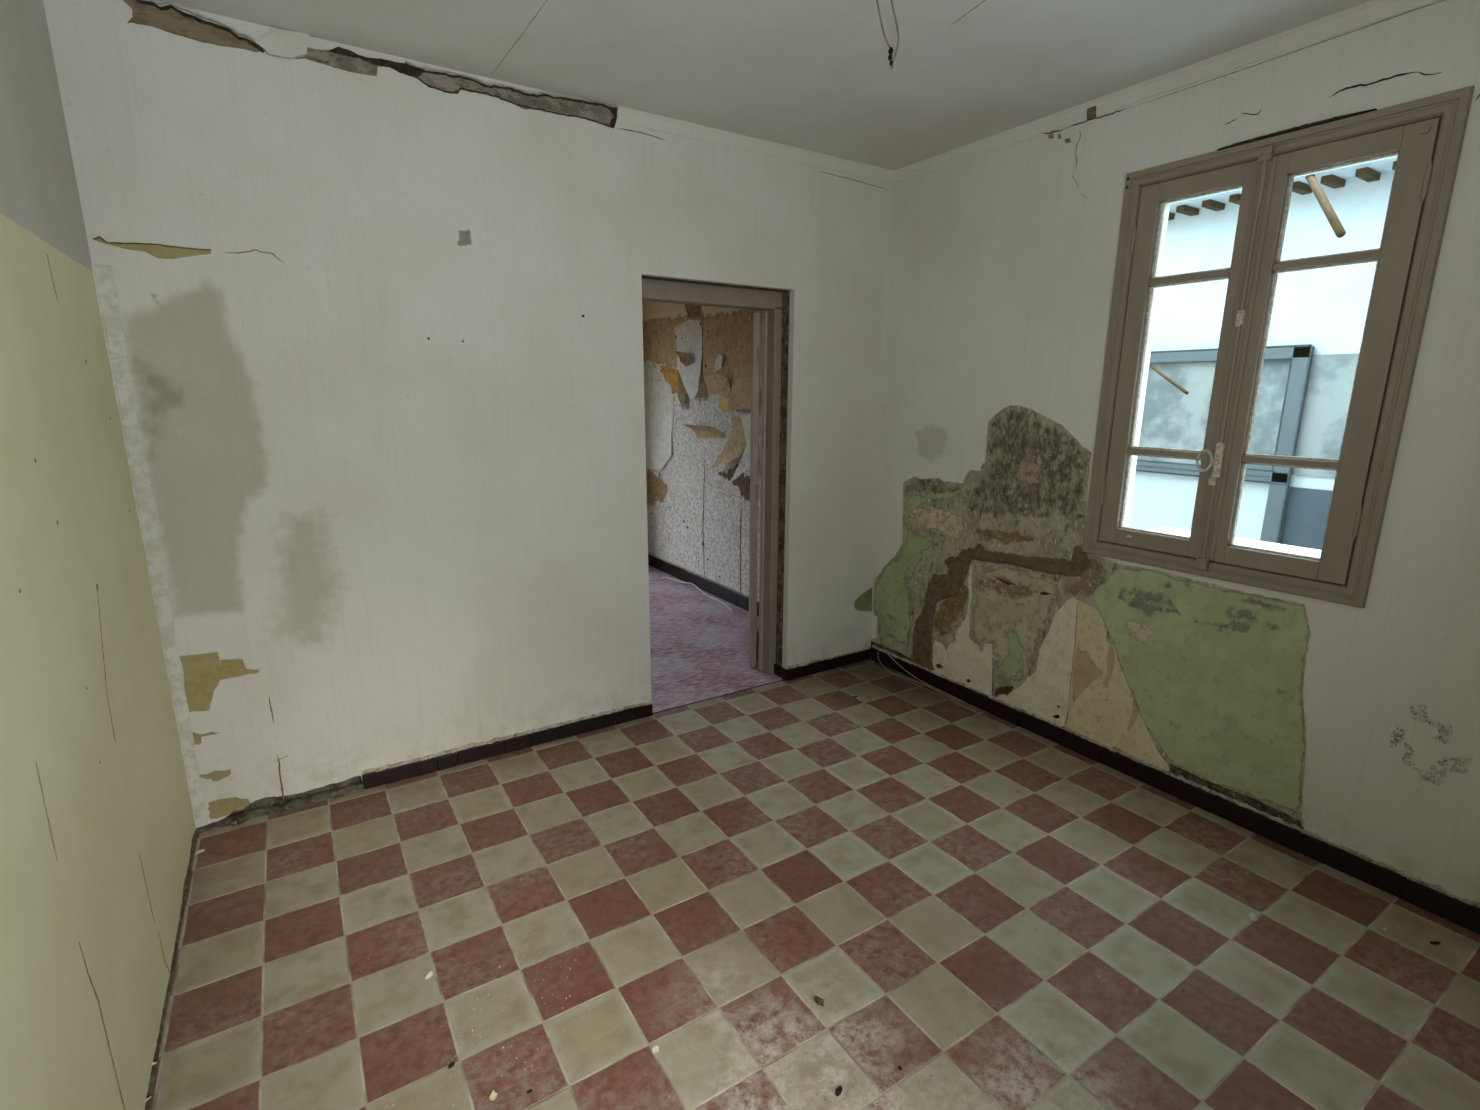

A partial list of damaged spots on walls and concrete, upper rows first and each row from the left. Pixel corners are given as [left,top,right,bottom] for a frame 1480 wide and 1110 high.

flaking render [123,0,617,128]
crack [1043,0,1445,198]
peeling [93,236,281,261]
flaking render [854,405,1311,830]
peeling [179,652,260,712]
peeling [192,732,217,744]
peeling [200,769,231,781]
peeling [208,797,250,819]